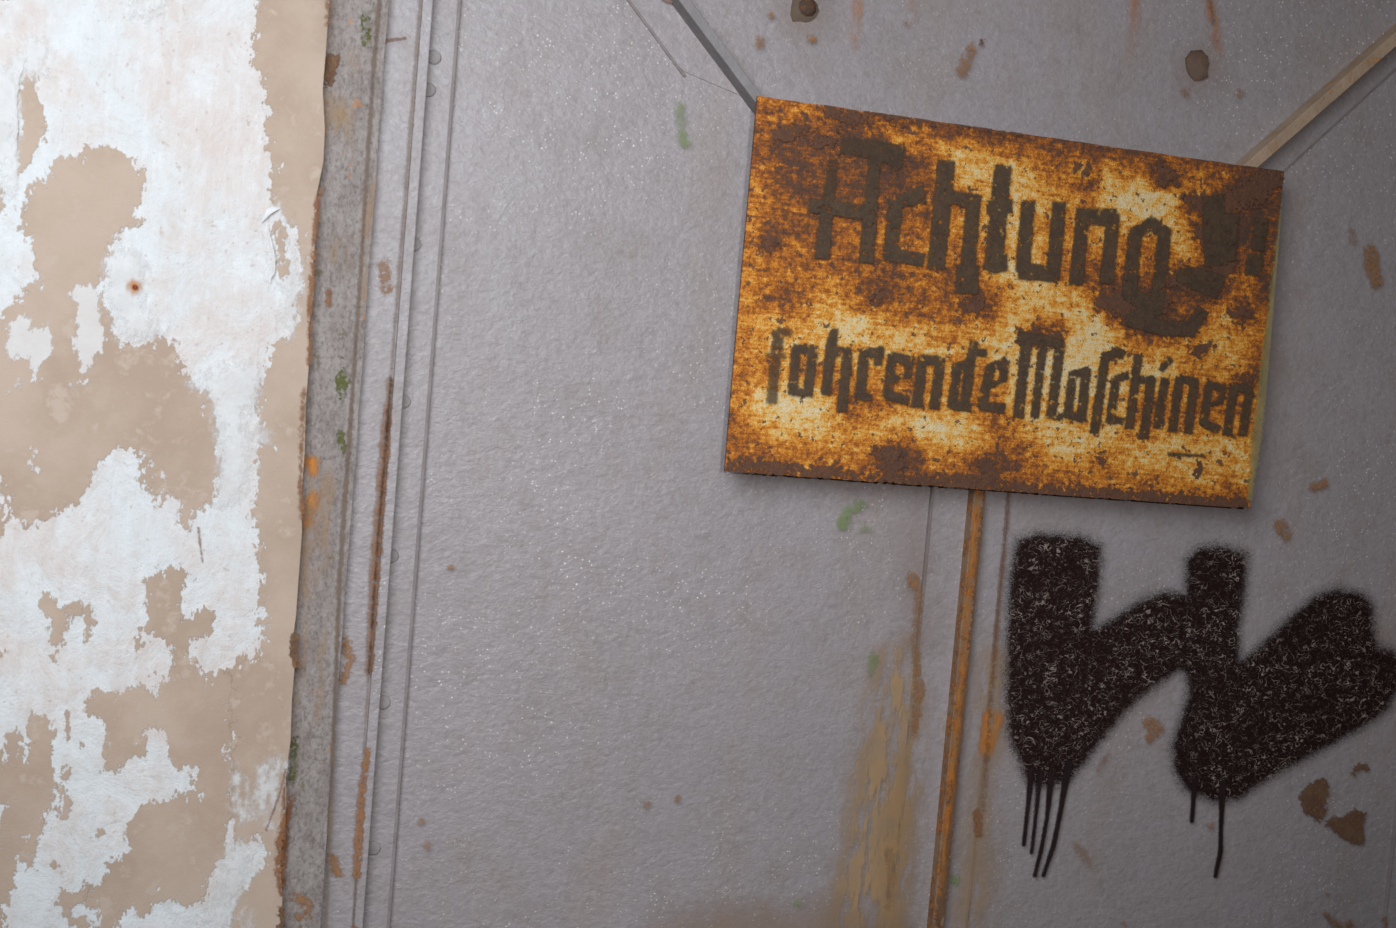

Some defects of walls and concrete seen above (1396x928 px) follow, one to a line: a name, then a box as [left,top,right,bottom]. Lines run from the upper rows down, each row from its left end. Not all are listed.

corrosion [957,39,986,78]
flaking render [0,0,331,928]
corrosion [280,0,421,928]
corrosion [830,572,925,928]
corrosion [935,489,986,928]
corrosion [981,597,1001,781]
peeling [1298,777,1367,846]